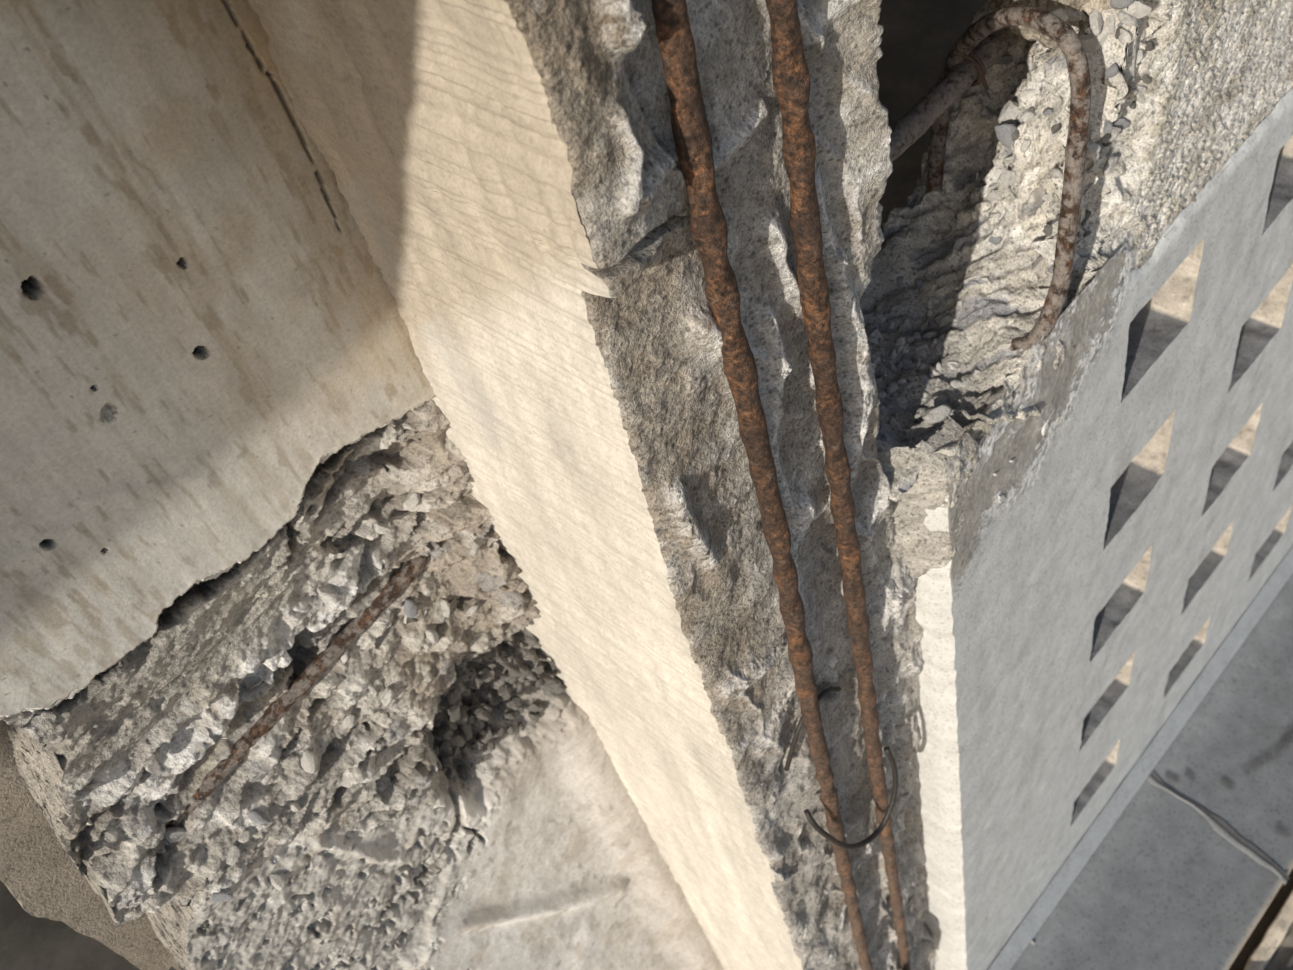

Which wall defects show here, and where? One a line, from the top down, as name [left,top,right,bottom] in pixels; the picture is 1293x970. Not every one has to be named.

spalling [1049,0,1155,268]
spalling [3,400,541,970]
spalling [504,0,1134,970]